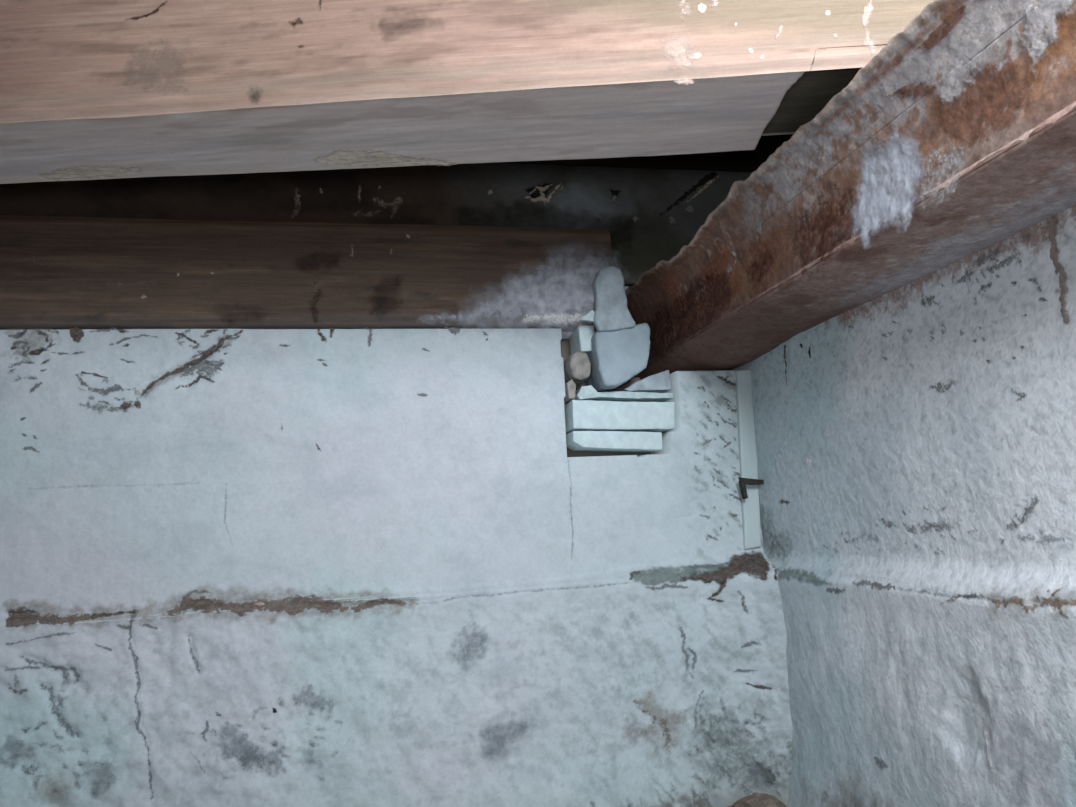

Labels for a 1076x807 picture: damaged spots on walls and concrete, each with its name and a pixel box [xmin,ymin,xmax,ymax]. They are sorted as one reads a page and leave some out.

rust [888,0,1076,145]
rust [795,184,857,274]
rust [839,205,1076,324]
rust [649,274,732,358]
crack [116,328,243,410]
crack [826,580,1076,618]
crack [6,590,415,797]
damp [215,728,284,767]